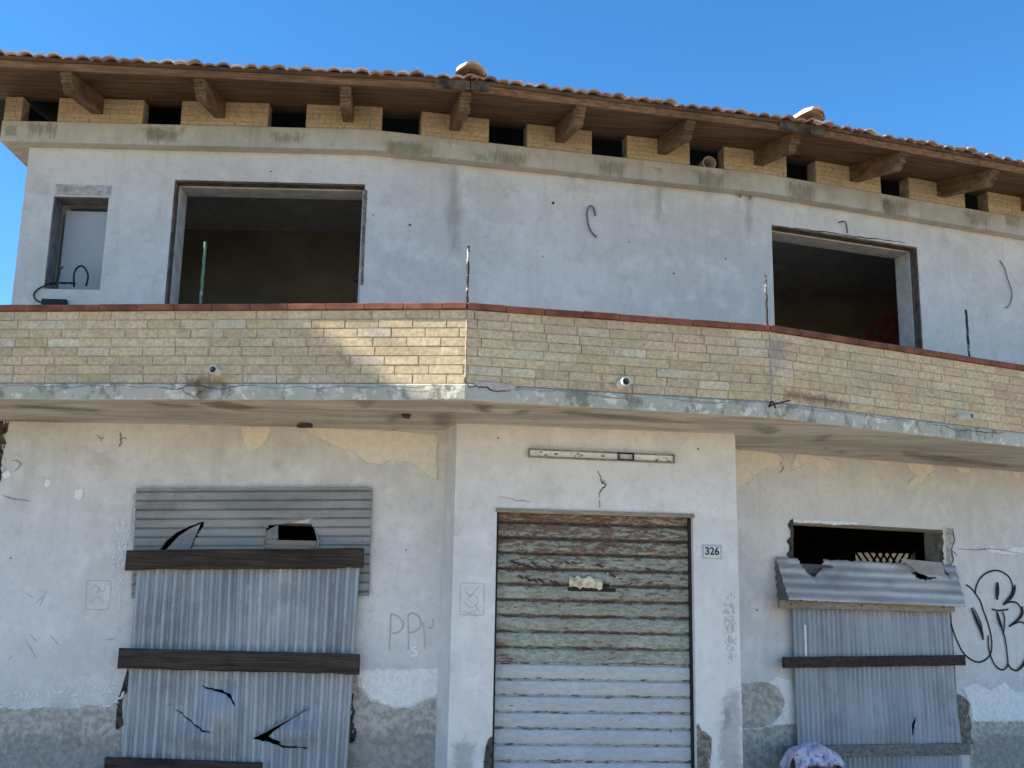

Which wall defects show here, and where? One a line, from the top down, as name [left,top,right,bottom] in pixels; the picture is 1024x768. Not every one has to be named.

crack [0,379,637,403]
peeling [238,426,274,453]
peeling [297,414,439,482]
peeling [735,449,839,491]
peeling [905,463,937,489]
peeling [786,519,859,558]
spalling [942,525,957,573]
peeling [0,669,129,768]
peeling [347,667,438,768]
peeling [741,676,797,768]
peeling [958,682,1024,768]